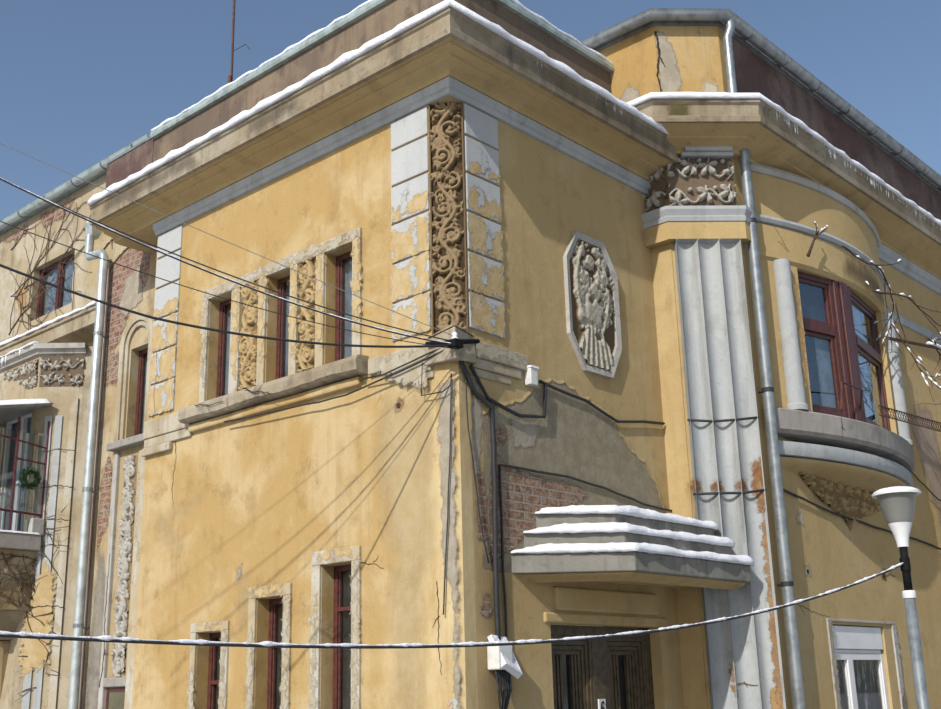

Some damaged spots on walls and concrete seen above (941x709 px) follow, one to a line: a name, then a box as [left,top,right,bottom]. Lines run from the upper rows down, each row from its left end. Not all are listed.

crack [654,31,665,92]
flaking render [88,238,151,387]
peeling [148,297,178,416]
peeling [390,188,430,339]
peeling [467,150,527,366]
peeling [307,594,319,709]
peeling [317,545,361,709]
flaking render [378,348,460,709]
flaking render [471,377,667,574]
peeling [751,460,783,709]